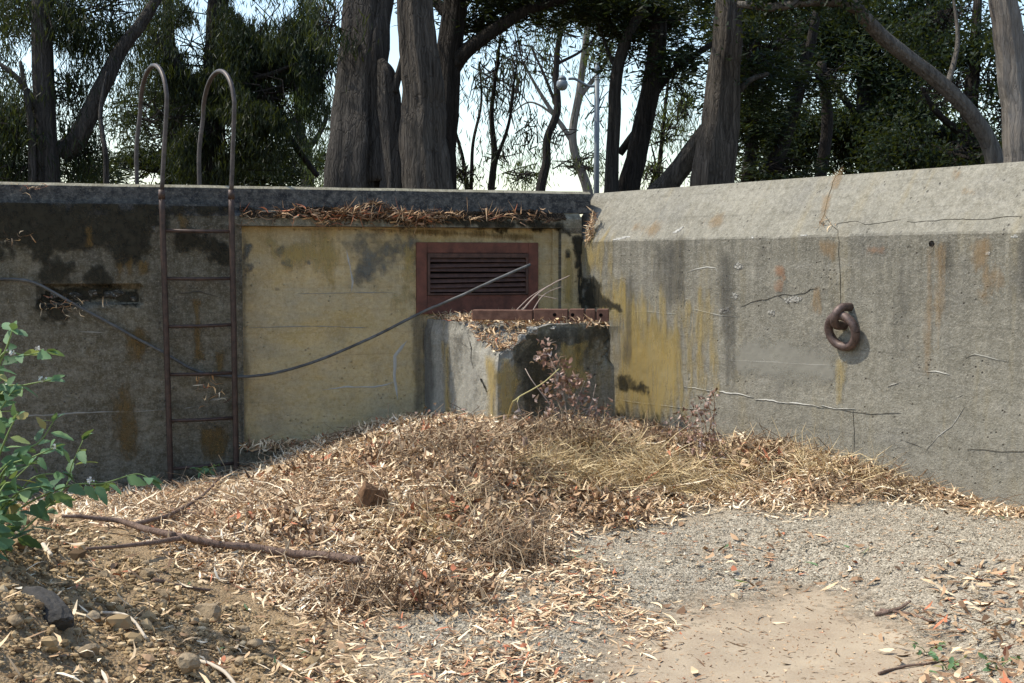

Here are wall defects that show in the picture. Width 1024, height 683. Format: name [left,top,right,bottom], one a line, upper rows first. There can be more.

water stain [354,235,416,282]
crack [578,172,1018,317]
water stain [602,282,679,427]
crack [617,387,885,434]